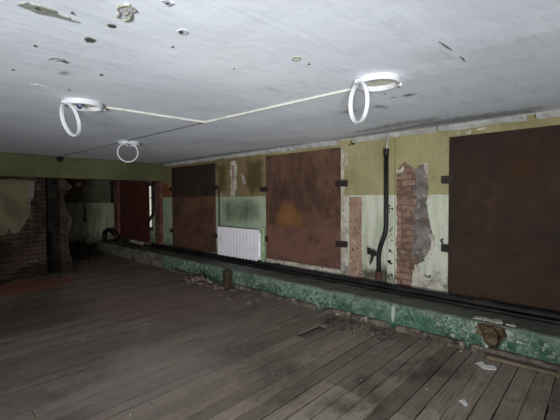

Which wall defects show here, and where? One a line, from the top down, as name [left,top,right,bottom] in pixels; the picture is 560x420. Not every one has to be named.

peeling [17,2,79,23]
peeling [116,4,136,21]
spalling [0,179,35,235]
spalling [387,162,449,294]
spalling [436,315,530,348]